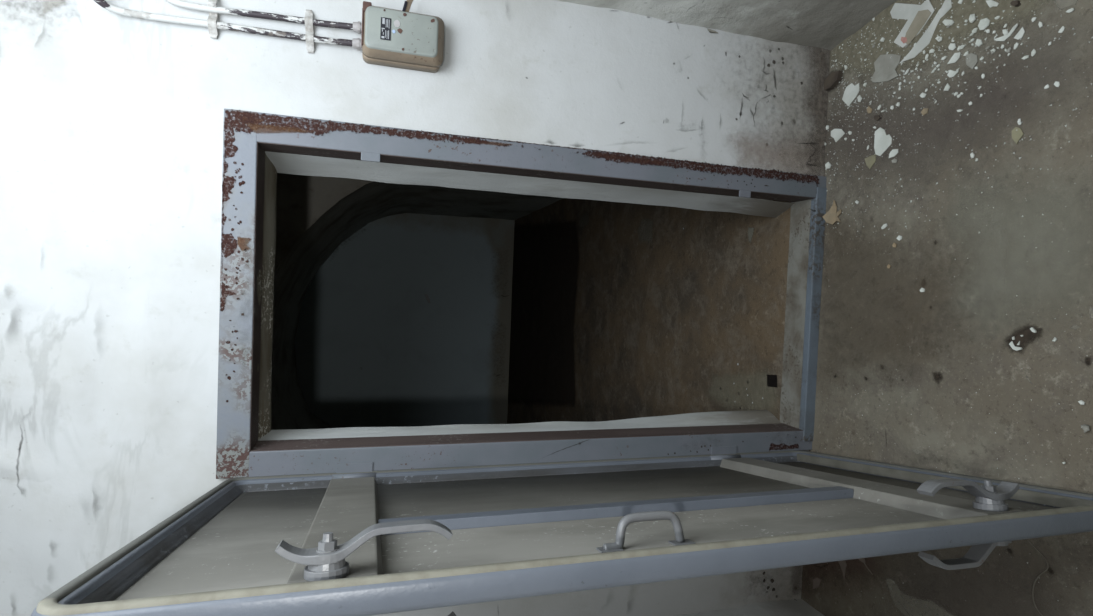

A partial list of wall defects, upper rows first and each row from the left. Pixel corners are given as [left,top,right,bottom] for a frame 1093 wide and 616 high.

peeling [935,19,956,50]
peeling [842,37,901,106]
peeling [943,53,978,91]
peeling [831,129,845,142]
peeling [823,200,842,224]
rust [220,109,819,380]